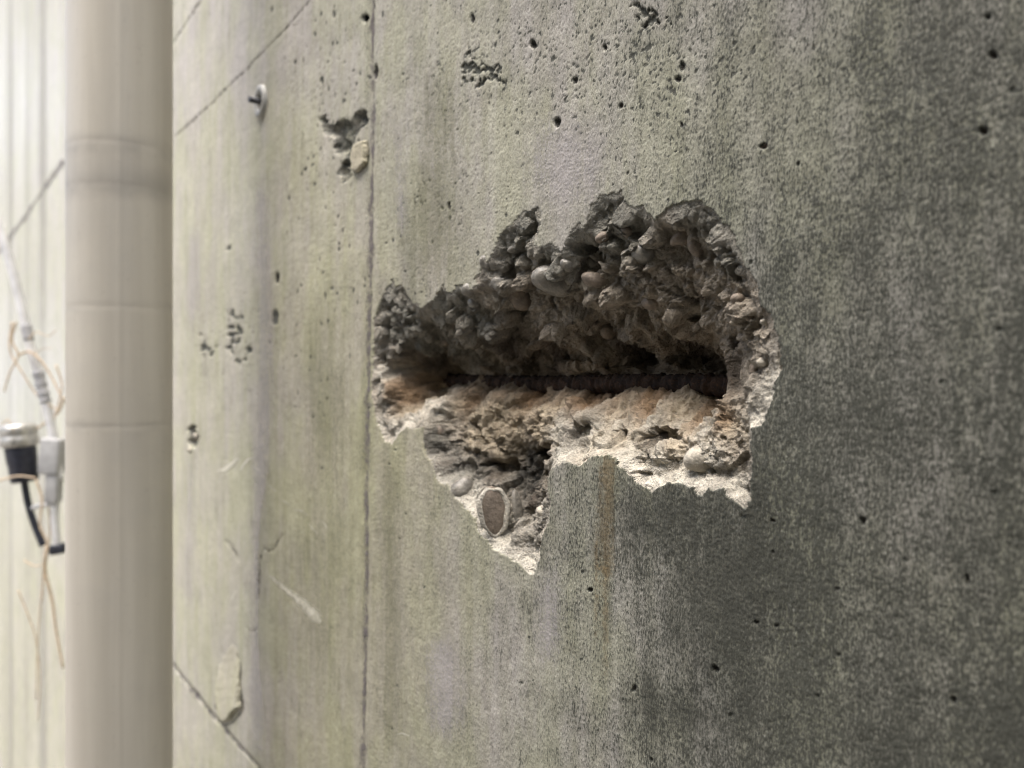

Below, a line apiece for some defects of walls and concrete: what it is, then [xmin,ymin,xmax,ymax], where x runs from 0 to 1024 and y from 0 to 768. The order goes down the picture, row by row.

spalling [317,109,369,183]
spalling [370,190,783,575]